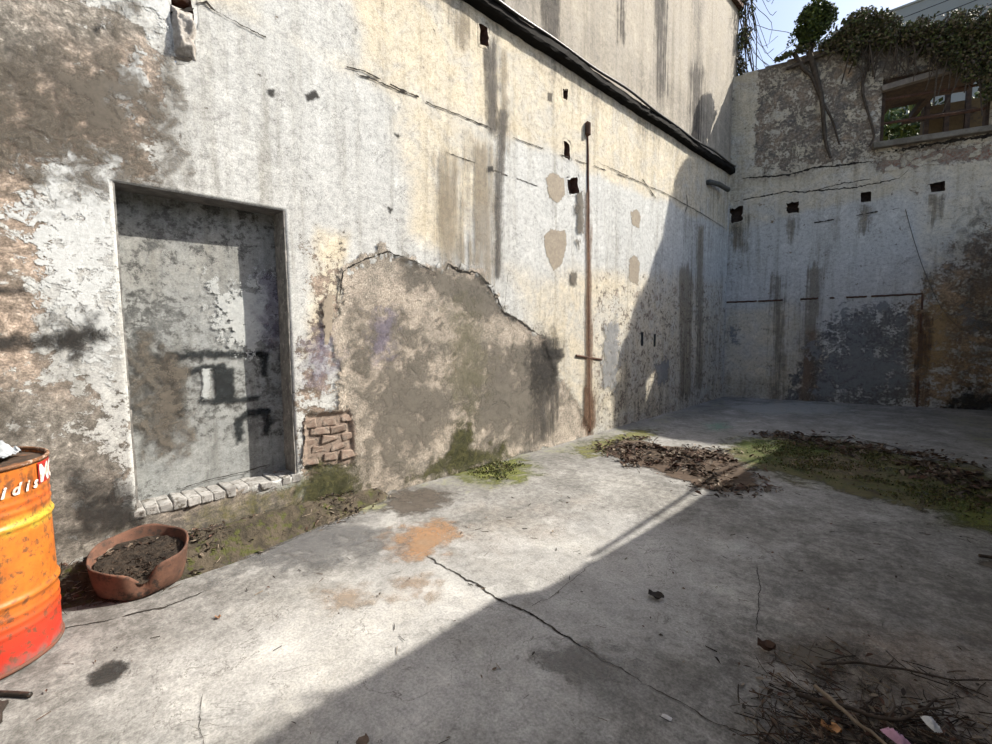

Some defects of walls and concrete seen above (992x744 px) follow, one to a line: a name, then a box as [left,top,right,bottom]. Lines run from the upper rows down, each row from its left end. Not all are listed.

peeling [84,0,198,127]
crack [346,66,490,128]
damp [440,38,508,279]
damp [541,0,560,39]
damp [655,0,669,97]
crack [733,161,908,202]
spalling [872,133,992,174]
peeling [0,125,139,392]
spalling [302,241,587,494]
rust [570,191,596,436]
rust [382,518,460,561]
crack [427,555,769,743]